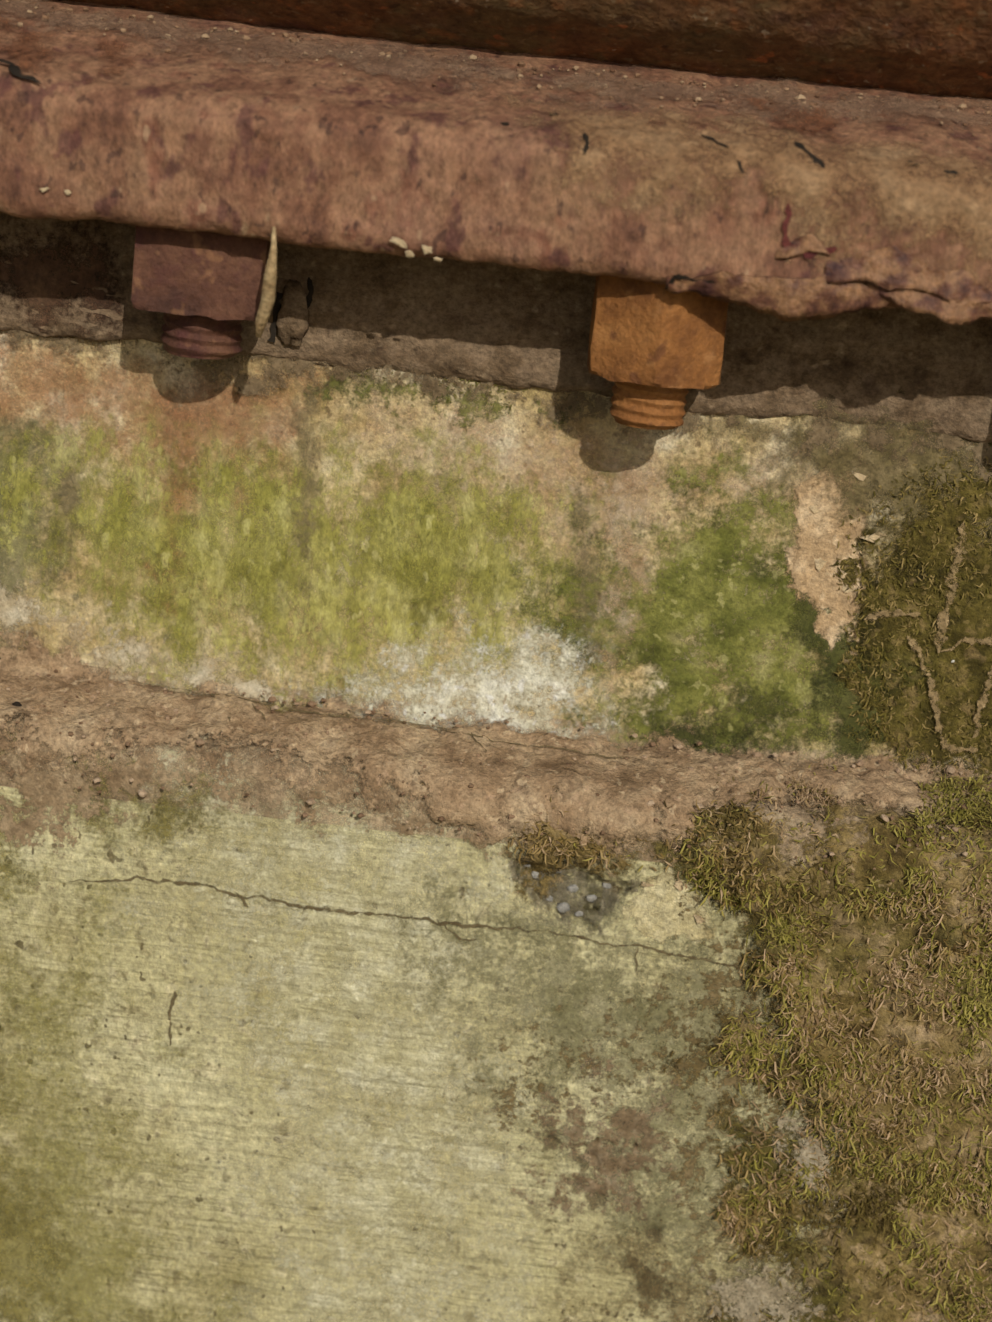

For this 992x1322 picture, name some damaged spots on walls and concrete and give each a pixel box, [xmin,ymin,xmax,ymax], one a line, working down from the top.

crack [0,59,42,84]
rust [389,237,442,262]
water stain [0,581,295,705]
water stain [313,550,617,739]
crack [71,875,752,976]